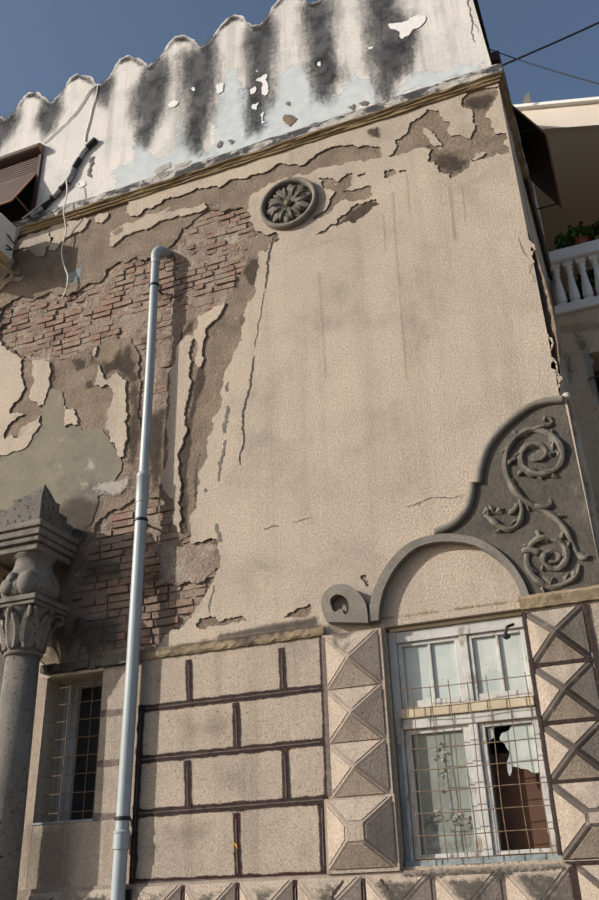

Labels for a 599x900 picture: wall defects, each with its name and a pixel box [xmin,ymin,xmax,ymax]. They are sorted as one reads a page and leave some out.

water stain [131,59,170,148]
water stain [182,41,218,151]
peeling [111,62,378,189]
water stain [243,17,276,130]
water stain [301,0,337,99]
peeling [388,15,426,39]
peeling [392,59,485,97]
crack [467,0,477,43]
crack [204,233,278,492]
flaking render [0,86,510,665]
crack [214,523,222,542]
crack [407,496,459,507]